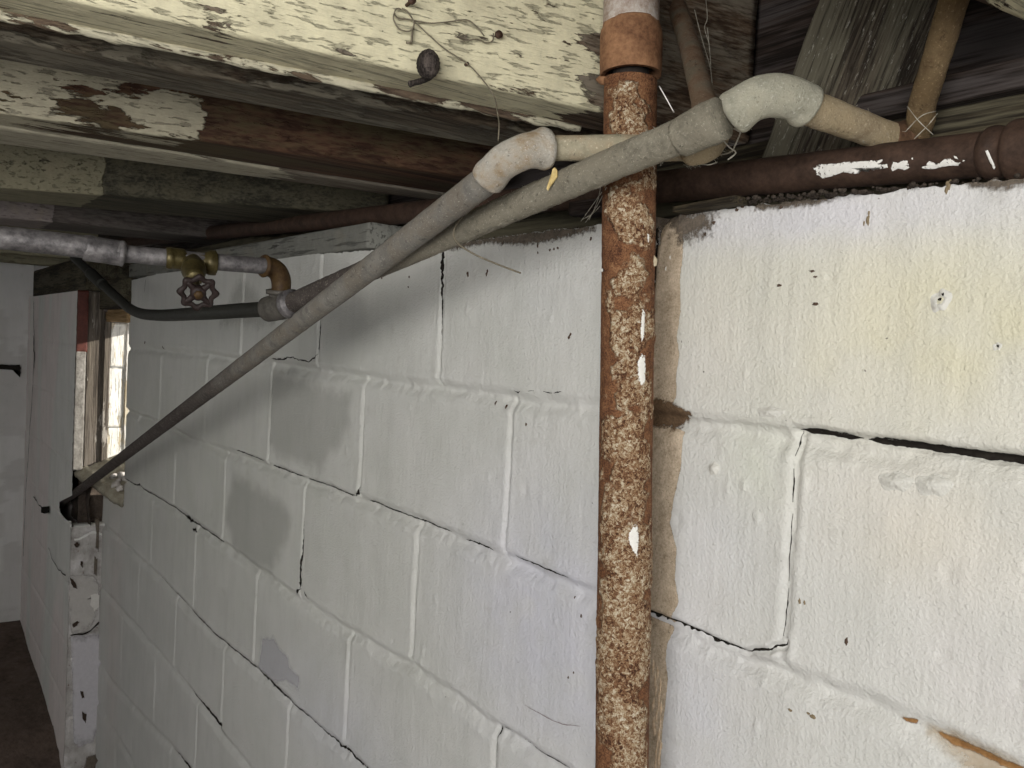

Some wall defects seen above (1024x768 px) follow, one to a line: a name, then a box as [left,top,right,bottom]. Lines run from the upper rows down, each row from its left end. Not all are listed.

crack [438,252,446,318]
crack [272,320,321,363]
crack [125,478,224,542]
crack [296,539,307,597]
crack [237,450,493,550]
crack [651,428,1024,652]
crack [165,580,368,768]